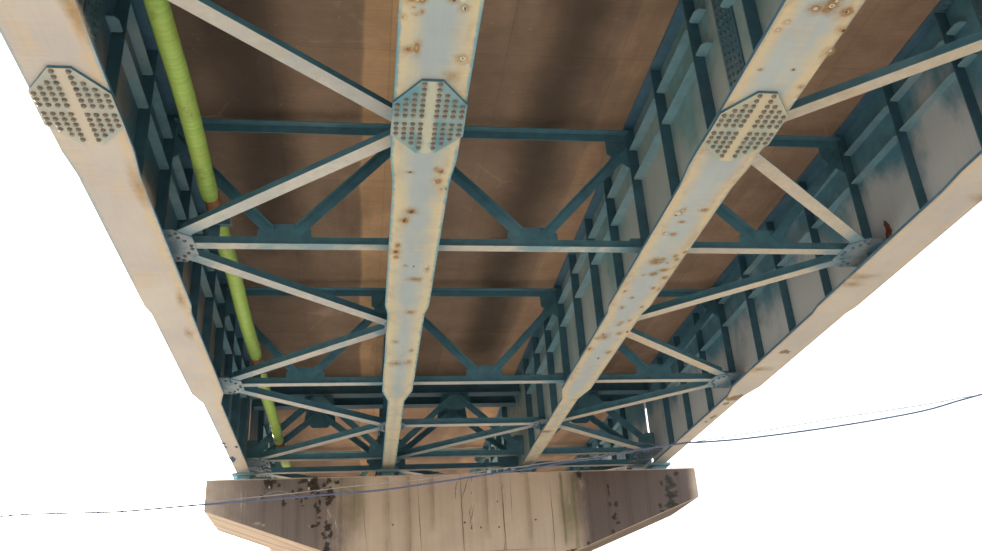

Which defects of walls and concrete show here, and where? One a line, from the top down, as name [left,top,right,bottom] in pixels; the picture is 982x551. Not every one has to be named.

rust [811,0,852,15]